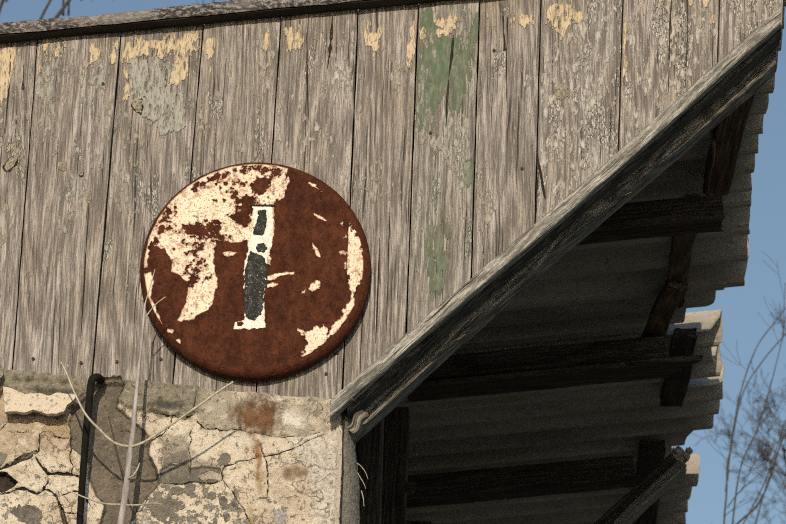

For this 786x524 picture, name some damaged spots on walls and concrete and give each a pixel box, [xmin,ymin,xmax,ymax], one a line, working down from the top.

peeling [0,44,16,106]
peeling [83,31,215,136]
peeling [364,20,384,58]
peeling [405,7,478,134]
peeling [510,12,535,30]
peeling [545,1,583,38]
peeling [424,206,456,301]
crack [0,422,91,524]
spalling [0,375,237,524]
crack [147,397,345,524]
rust [231,398,280,479]